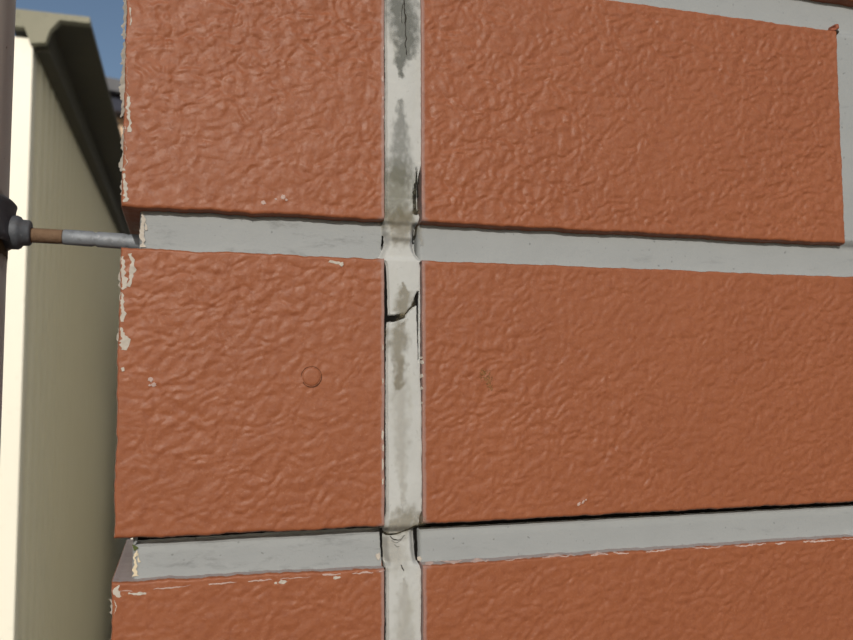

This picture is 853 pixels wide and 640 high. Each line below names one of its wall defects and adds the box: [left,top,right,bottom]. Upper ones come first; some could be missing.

leakage [390,0,417,77]
peeling [118,0,132,202]
peeling [139,212,147,247]
peeling [117,253,137,350]
crack [379,0,419,640]
peeling [109,585,146,614]
peeling [132,545,140,577]